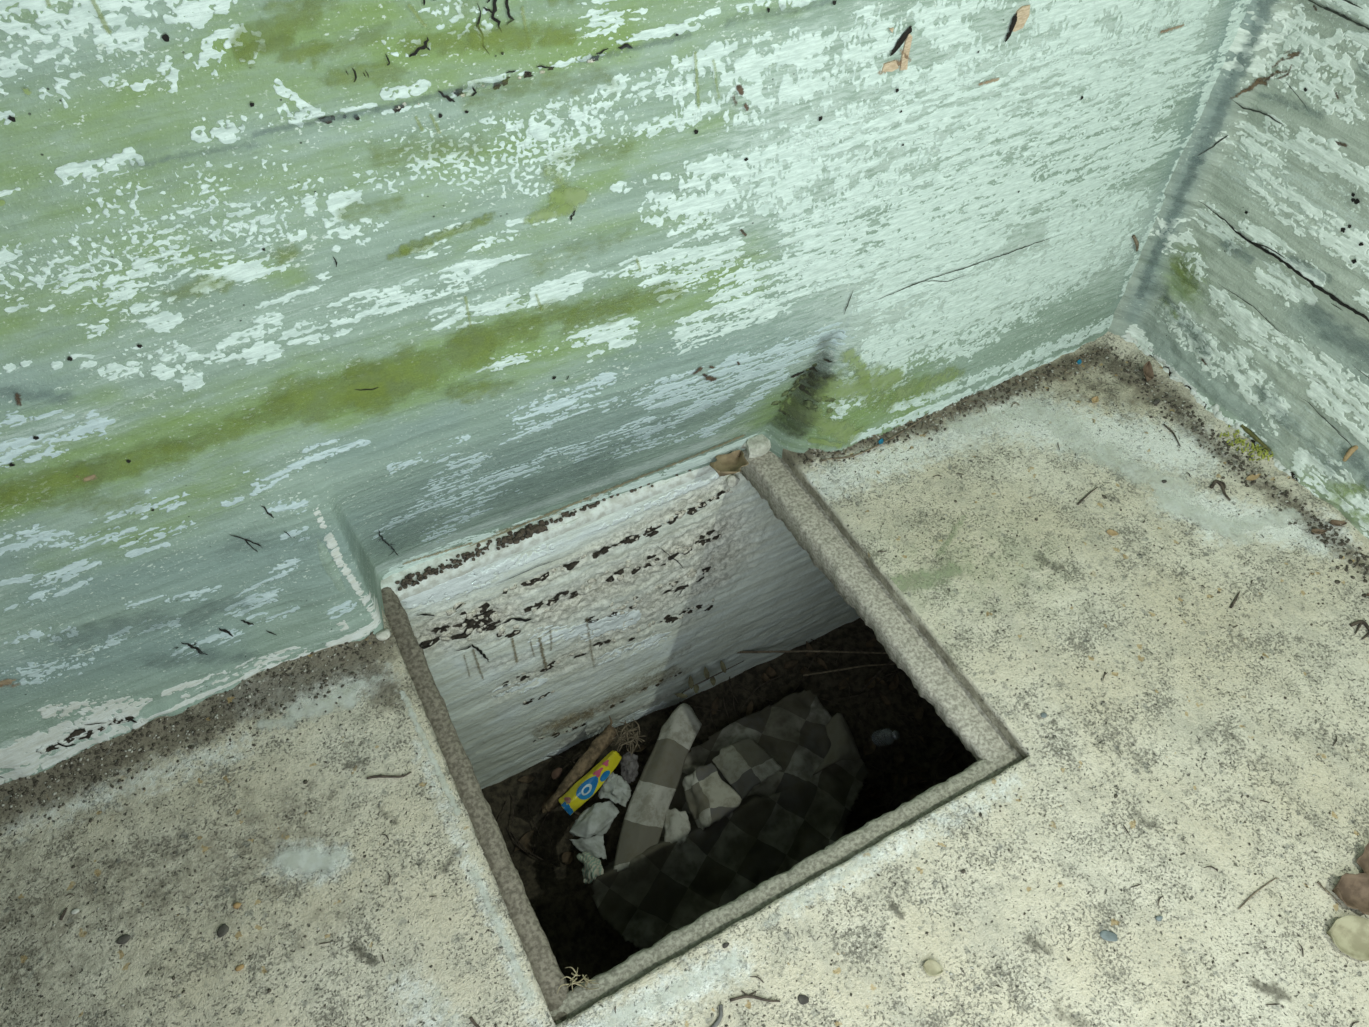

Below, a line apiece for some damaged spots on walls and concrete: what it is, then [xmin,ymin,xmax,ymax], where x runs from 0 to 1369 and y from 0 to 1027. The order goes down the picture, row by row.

peeling [0,0,266,125]
peeling [0,147,404,333]
peeling [50,211,558,392]
damp [389,214,491,257]
damp [525,168,588,224]
peeling [401,0,1369,407]
crack [1198,201,1369,322]
damp [270,319,537,421]
damp [783,349,959,449]
crack [1301,398,1351,445]
damp [403,435,744,565]
spalling [0,313,1023,1025]